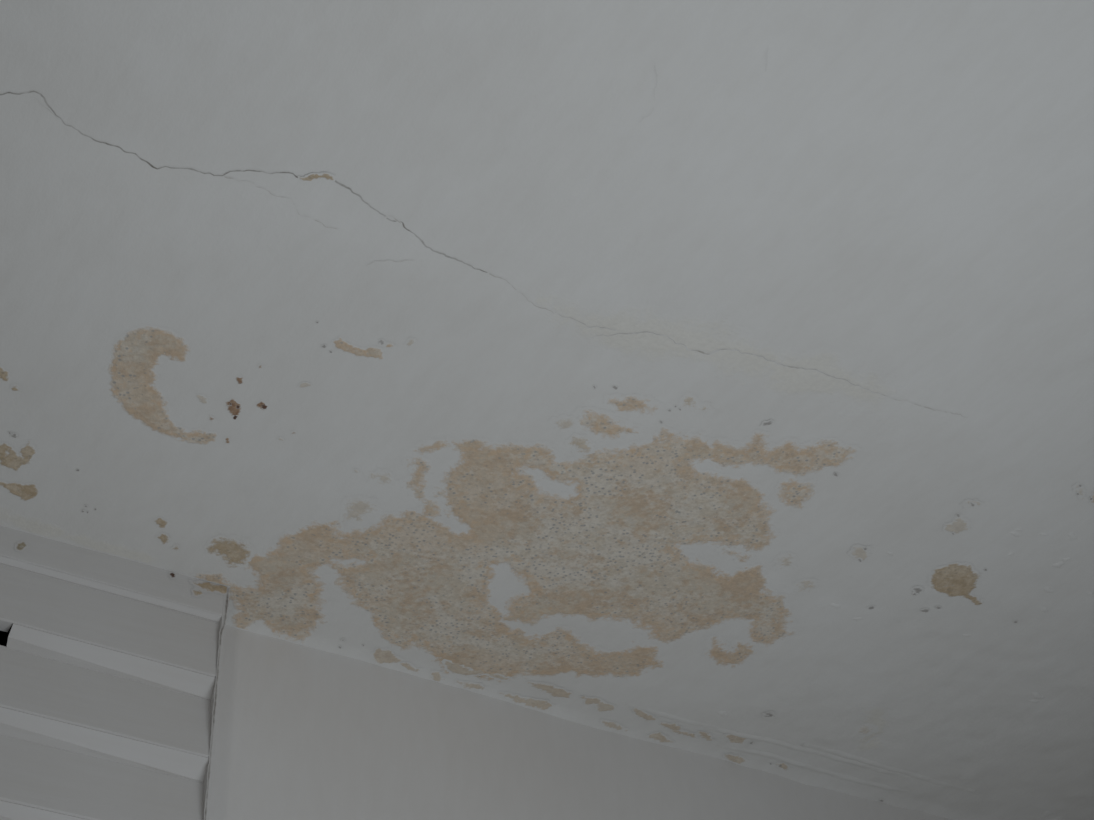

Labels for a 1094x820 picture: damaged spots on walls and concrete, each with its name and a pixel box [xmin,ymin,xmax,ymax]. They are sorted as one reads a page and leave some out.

crack [0,90,969,418]
peeling [320,336,419,362]
peeling [103,323,220,447]
peeling [0,432,41,503]
peeling [189,384,862,733]
peeling [910,561,988,613]
peeling [631,707,755,764]